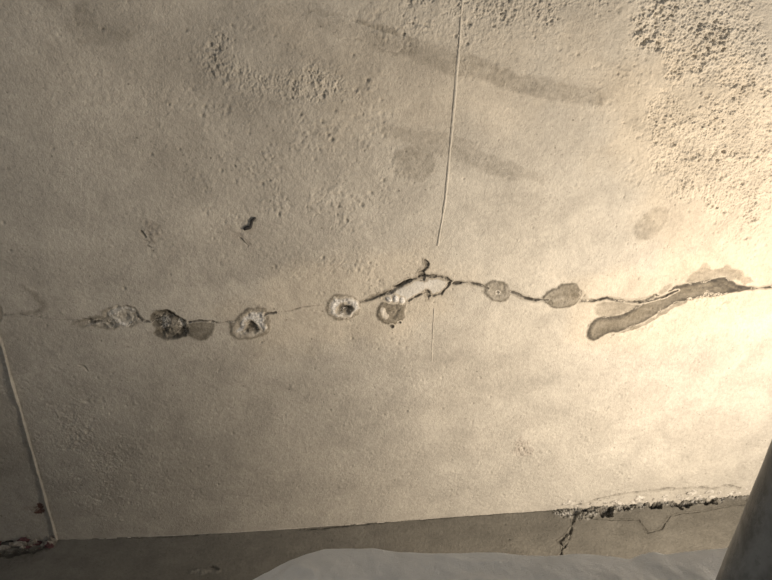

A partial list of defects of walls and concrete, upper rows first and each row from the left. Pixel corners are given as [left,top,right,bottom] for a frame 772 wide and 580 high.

spalling [71,303,190,342]
crack [262,304,330,317]
crack [359,257,550,304]
damp [481,278,511,303]
damp [541,281,674,318]
crack [578,288,680,305]
damp [685,262,755,285]
crack [751,283,772,291]
spalling [551,483,749,522]